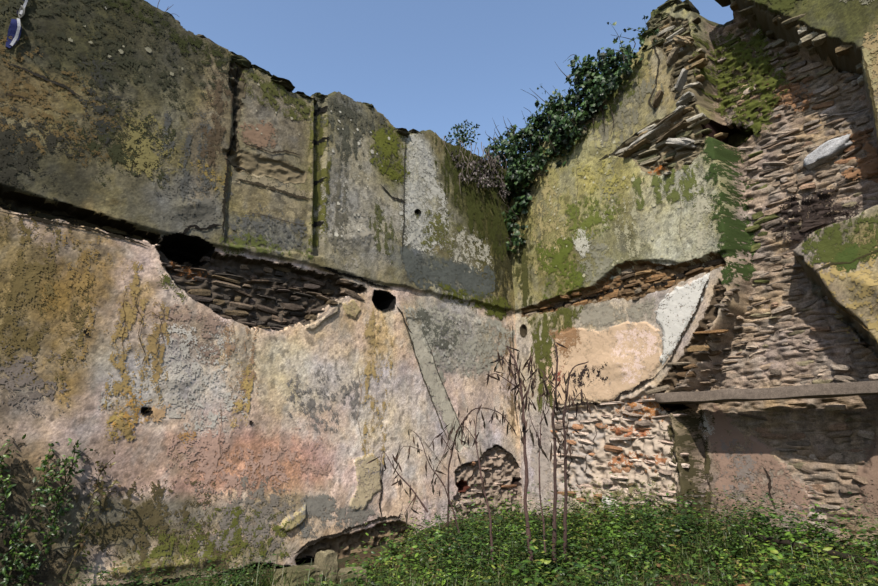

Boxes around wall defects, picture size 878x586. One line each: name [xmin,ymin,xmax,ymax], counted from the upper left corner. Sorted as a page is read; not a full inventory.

damp [0,0,239,416]
crack [0,63,329,247]
damp [0,302,361,586]
spalling [0,186,367,330]
spalling [220,453,415,575]
damp [486,170,570,431]
spalling [449,252,729,522]
damp [571,364,608,389]
damp [577,193,650,292]
spalling [611,13,729,176]
spalling [730,0,878,133]
spalling [794,255,878,358]